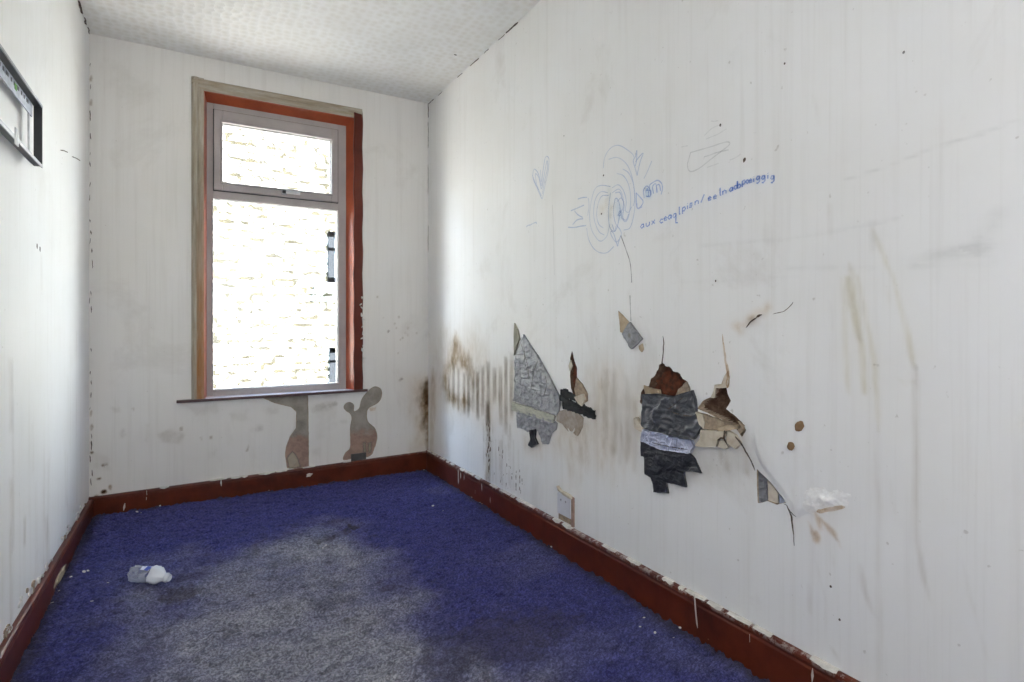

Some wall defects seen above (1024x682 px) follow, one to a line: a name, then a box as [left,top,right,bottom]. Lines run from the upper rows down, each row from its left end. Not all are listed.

peeling [210,395,315,481]
peeling [343,386,382,463]
peeling [556,352,588,436]
flaking render [640,364,691,404]
flaking render [695,371,746,449]
crack [717,430,755,470]
spalling [757,470,786,505]
crack [785,504,796,542]